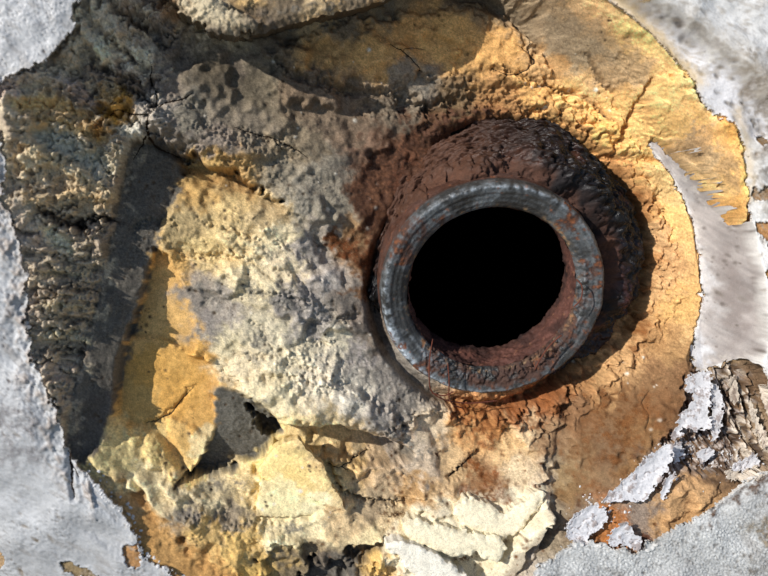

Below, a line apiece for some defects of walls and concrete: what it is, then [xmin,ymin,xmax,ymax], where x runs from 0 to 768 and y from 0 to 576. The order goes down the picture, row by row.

corrosion [323,107,494,302]
peeling [751,186,768,201]
peeling [755,222,768,247]
peeling [724,384,768,482]
peeling [564,370,740,551]
peeling [60,561,99,576]
peeling [123,544,141,569]